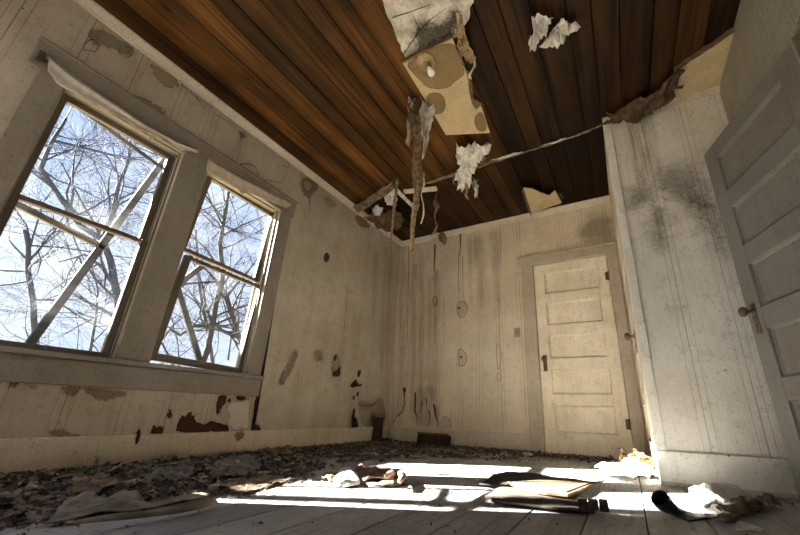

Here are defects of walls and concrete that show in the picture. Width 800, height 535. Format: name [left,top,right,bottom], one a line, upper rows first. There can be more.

peeling [150,64,183,88]
leakage [408,9,465,114]
leakage [474,112,487,132]
peeling [331,354,341,378]
spalling [151,395,261,434]
spalling [350,370,361,427]